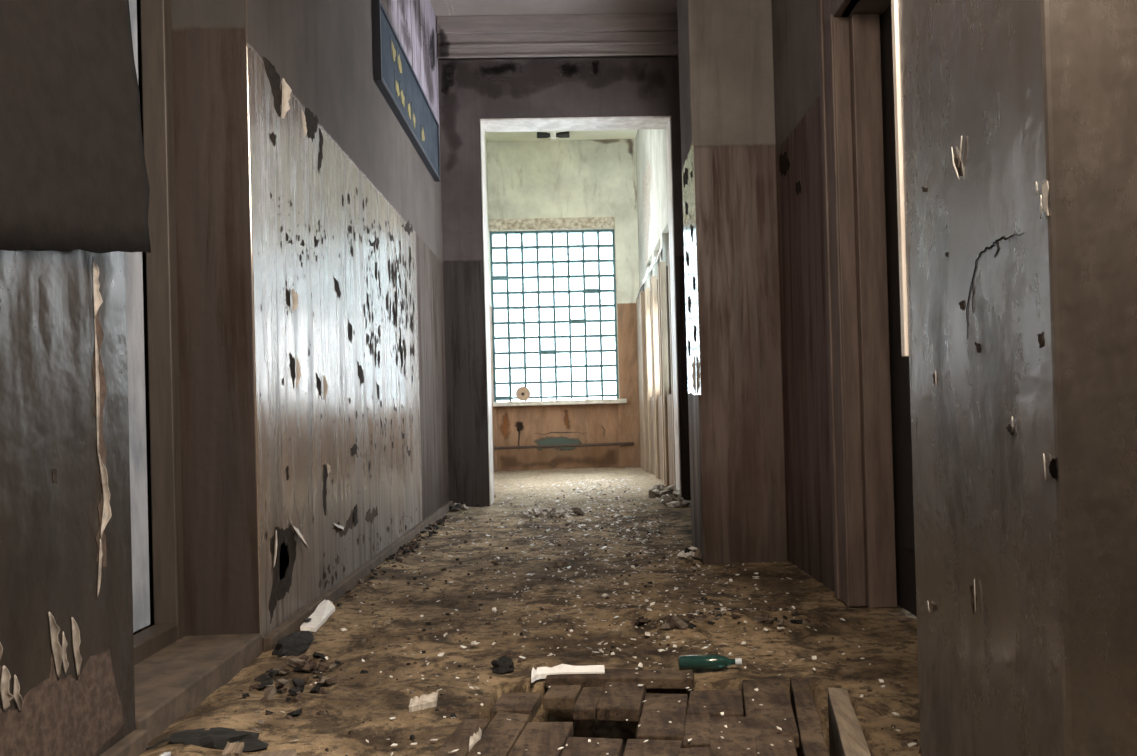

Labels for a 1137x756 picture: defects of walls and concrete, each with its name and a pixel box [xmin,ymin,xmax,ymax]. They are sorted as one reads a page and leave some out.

peeling [263,57,323,173]
leakage [388,0,662,169]
peeling [0,0,151,598]
peeling [271,188,415,484]
crack [966,233,1023,339]
peeling [266,523,310,624]
peeling [313,463,417,590]